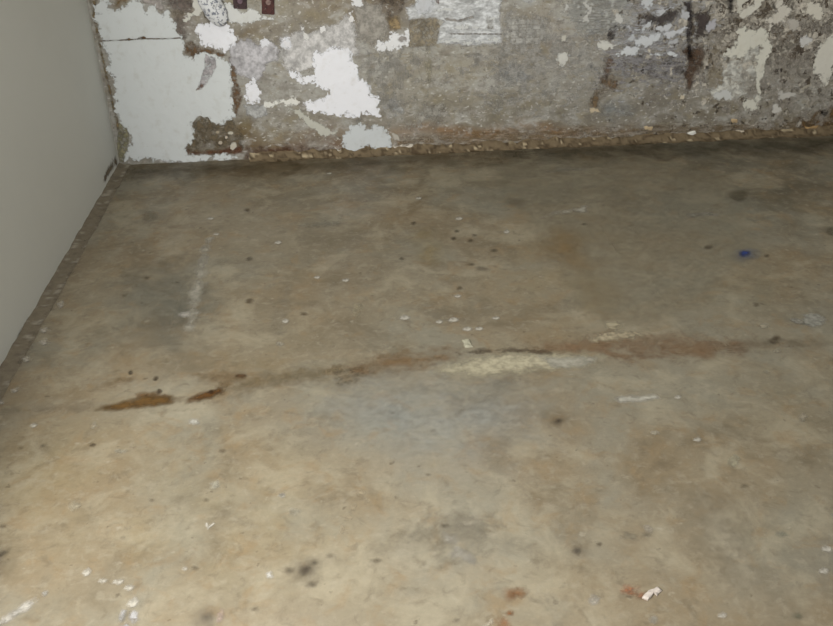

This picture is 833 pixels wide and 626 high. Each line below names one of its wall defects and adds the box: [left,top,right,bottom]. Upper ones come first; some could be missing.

peeling [556,52,568,67]
corrosion [683,47,714,88]
peeling [597,0,833,135]
peeling [92,0,440,181]
corrosion [103,377,171,410]
corrosion [189,389,221,402]